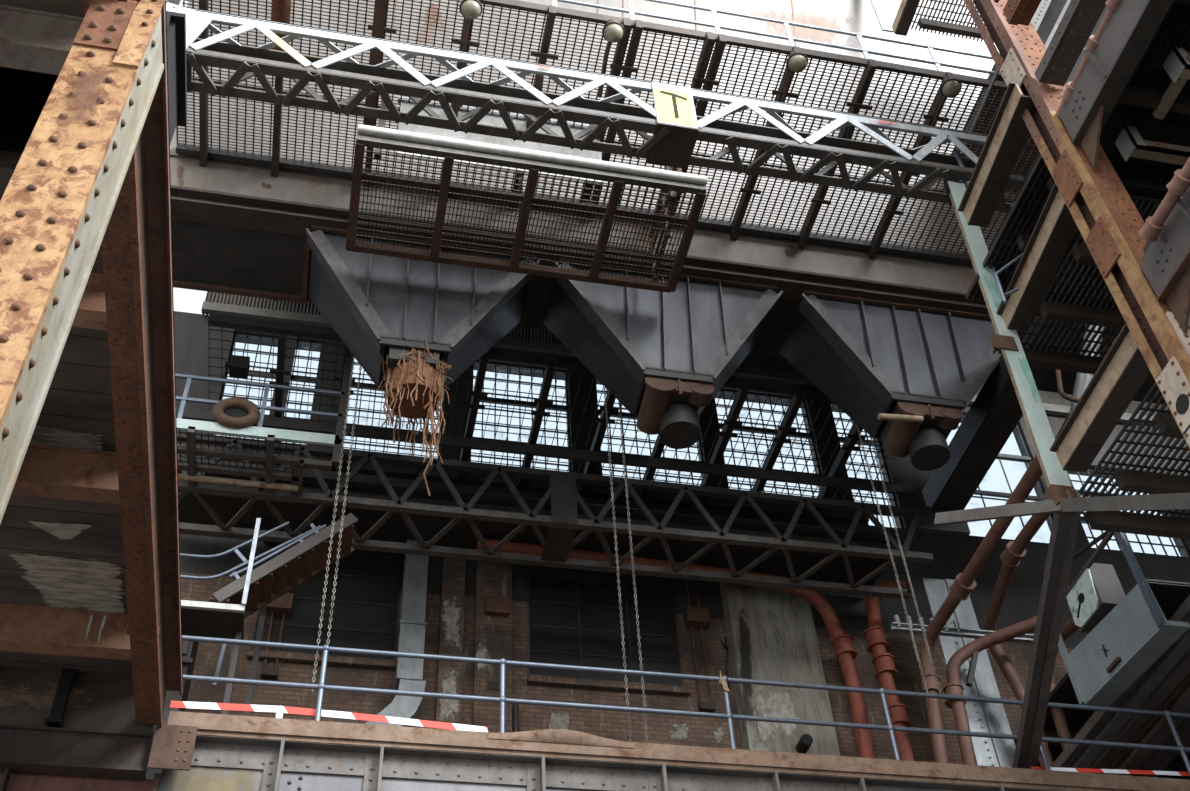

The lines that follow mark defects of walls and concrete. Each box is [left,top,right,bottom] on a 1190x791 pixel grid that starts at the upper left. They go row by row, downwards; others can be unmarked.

spalling [29,521,92,540]
spalling [9,553,126,613]
leakage [739,610,753,723]